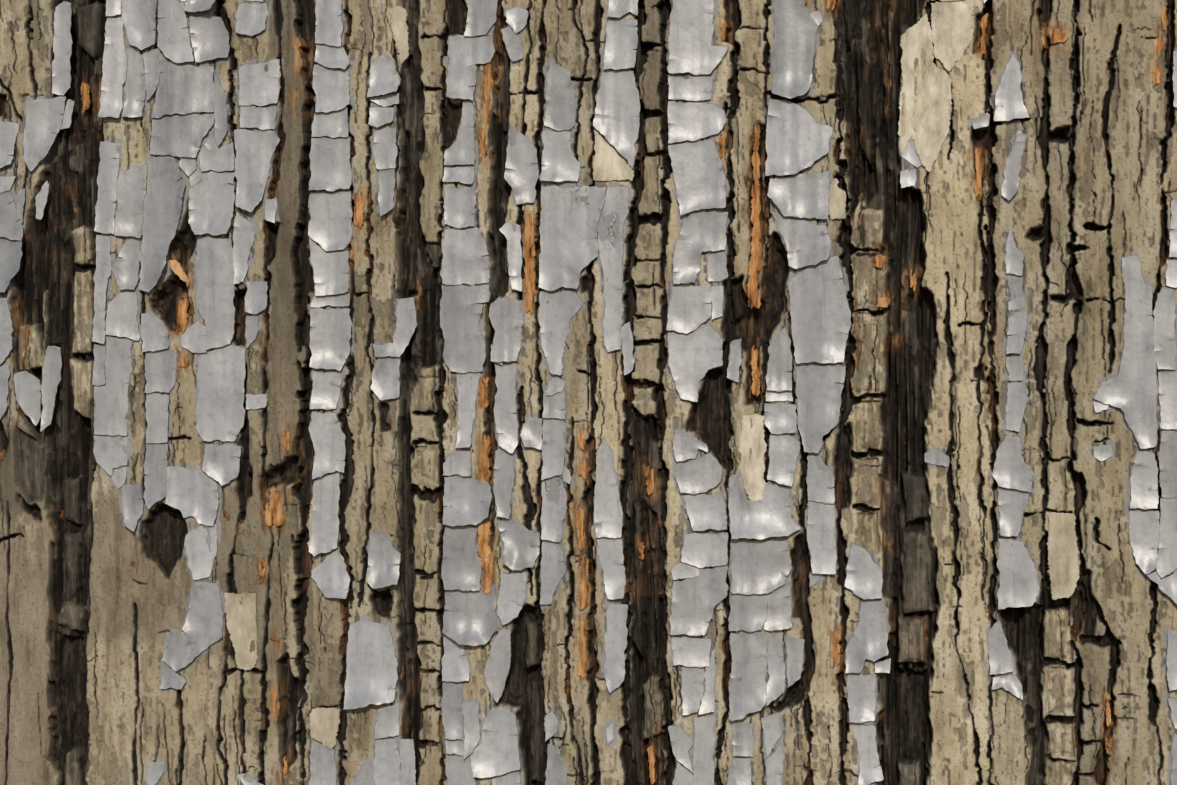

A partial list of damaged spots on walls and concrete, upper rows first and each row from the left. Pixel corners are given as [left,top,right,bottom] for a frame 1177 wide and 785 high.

crack [0,502,25,571]
crack [0,7,38,120]
peeling [0,1,75,432]
peeling [92,0,281,689]
peeling [307,0,353,599]
peeling [309,620,416,785]
peeling [367,6,409,216]
peeling [440,0,640,785]
crack [511,0,676,785]
peeling [666,0,891,785]
peeling [987,226,1080,700]
peeling [1093,200,1177,604]